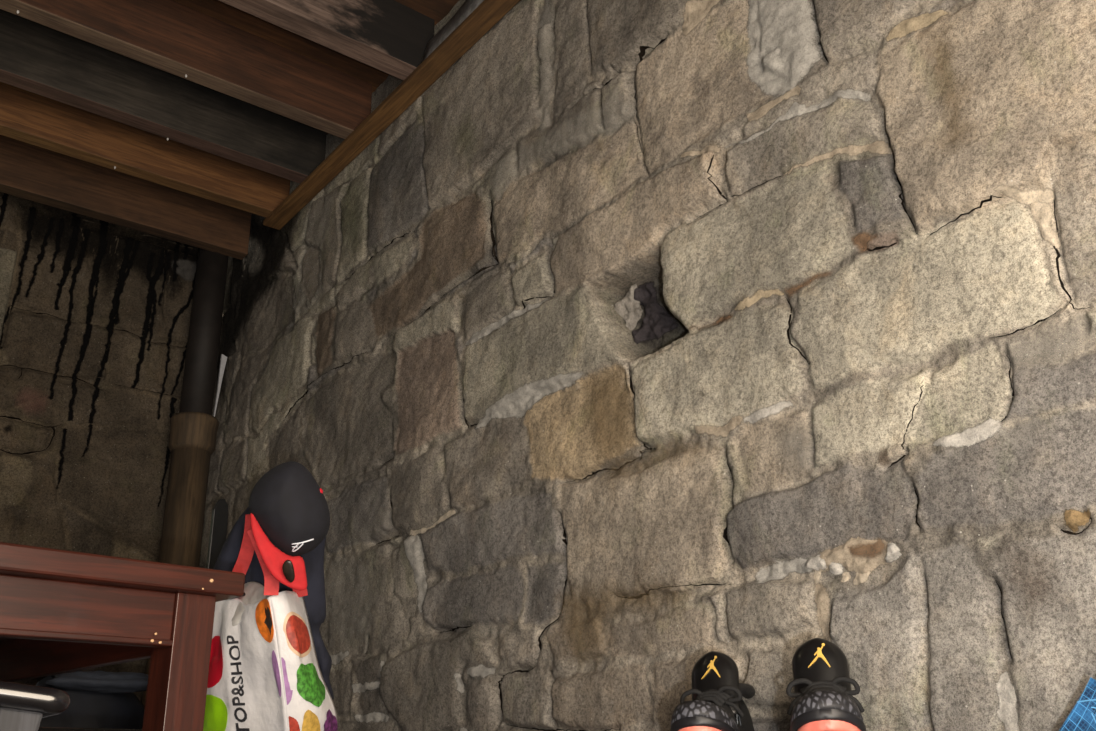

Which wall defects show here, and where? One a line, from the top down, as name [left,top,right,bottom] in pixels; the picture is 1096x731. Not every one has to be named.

damp [0,207,198,489]
spalling [614,281,678,344]